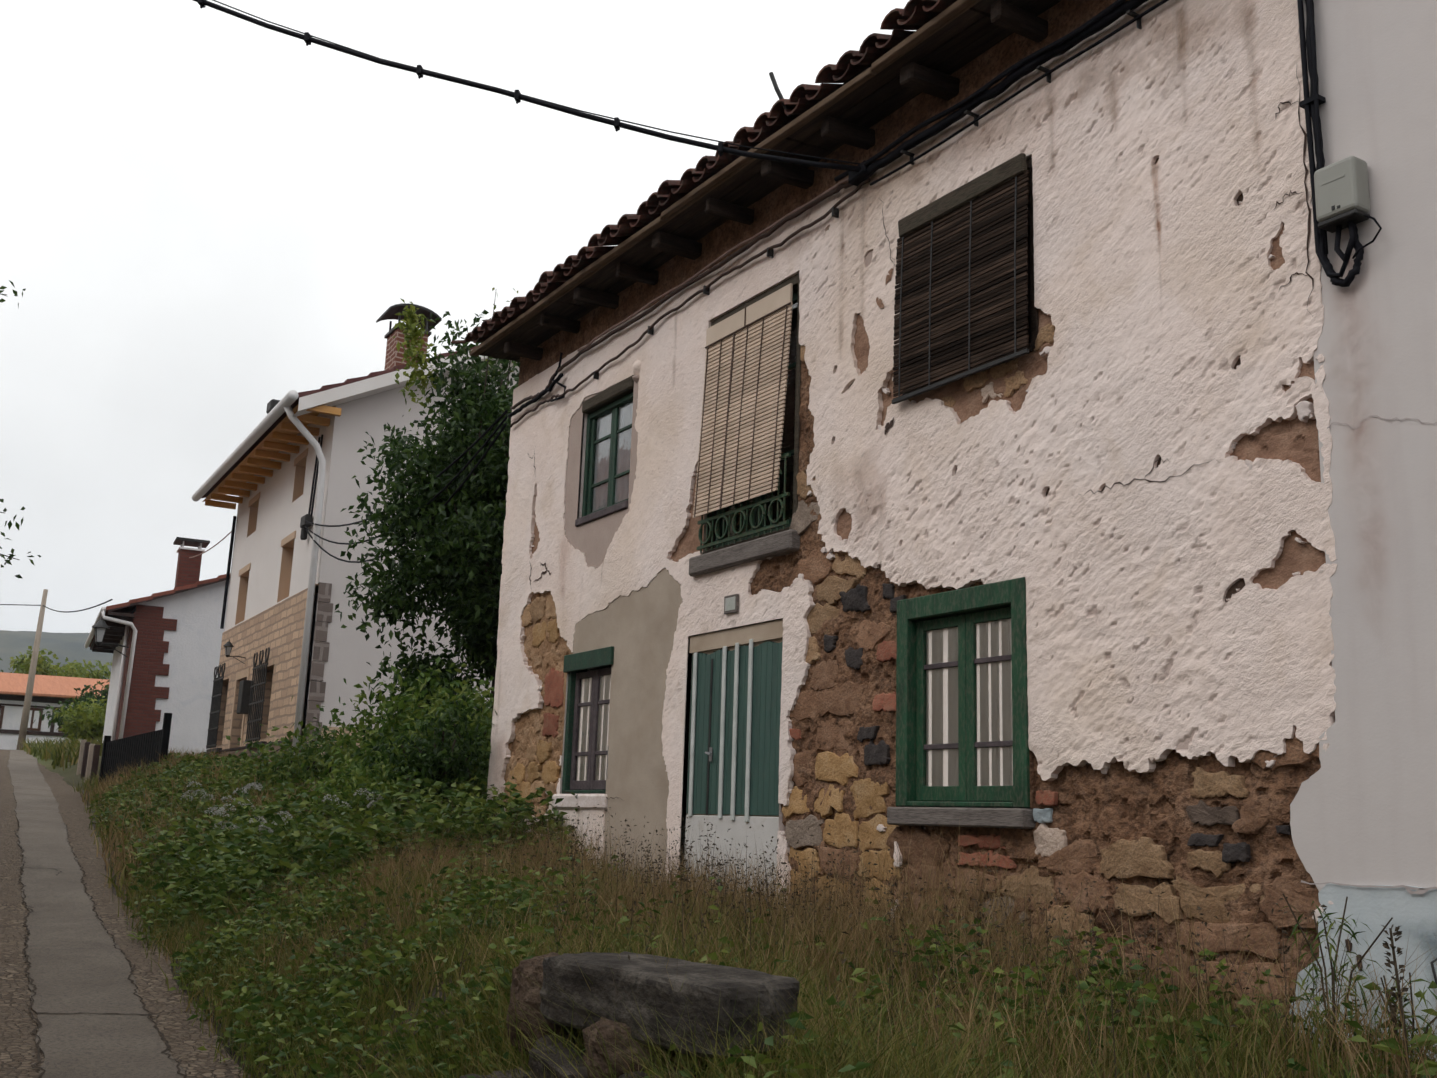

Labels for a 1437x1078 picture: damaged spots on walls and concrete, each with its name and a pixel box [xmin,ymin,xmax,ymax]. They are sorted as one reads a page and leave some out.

peeling [1268,224,1285,270]
spalling [876,268,893,309]
peeling [848,314,870,389]
peeling [878,309,1055,435]
crack [1327,415,1437,429]
peeling [670,421,708,562]
crack [1075,459,1212,498]
peeling [503,591,573,817]
flaking render [751,346,1437,1037]